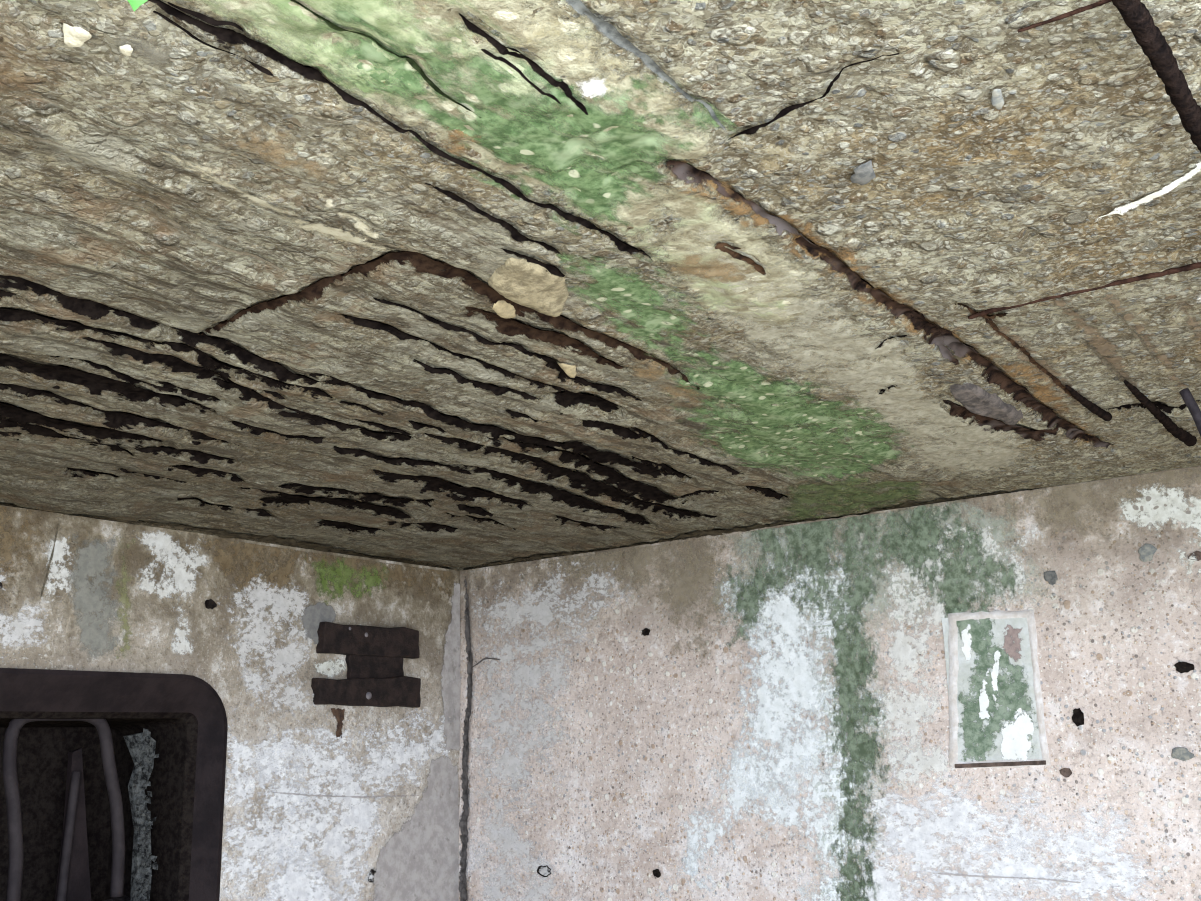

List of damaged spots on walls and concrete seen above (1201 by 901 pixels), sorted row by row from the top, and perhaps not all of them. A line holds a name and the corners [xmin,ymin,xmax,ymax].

crack [148,0,652,277]
damp [504,22,624,98]
crack [728,53,900,140]
damp [155,152,386,251]
crack [715,242,766,275]
damp [702,230,1023,473]
damp [0,536,119,658]
crack [0,275,1033,901]
damp [137,530,455,901]
rust [331,708,345,738]
damp [469,468,1201,901]